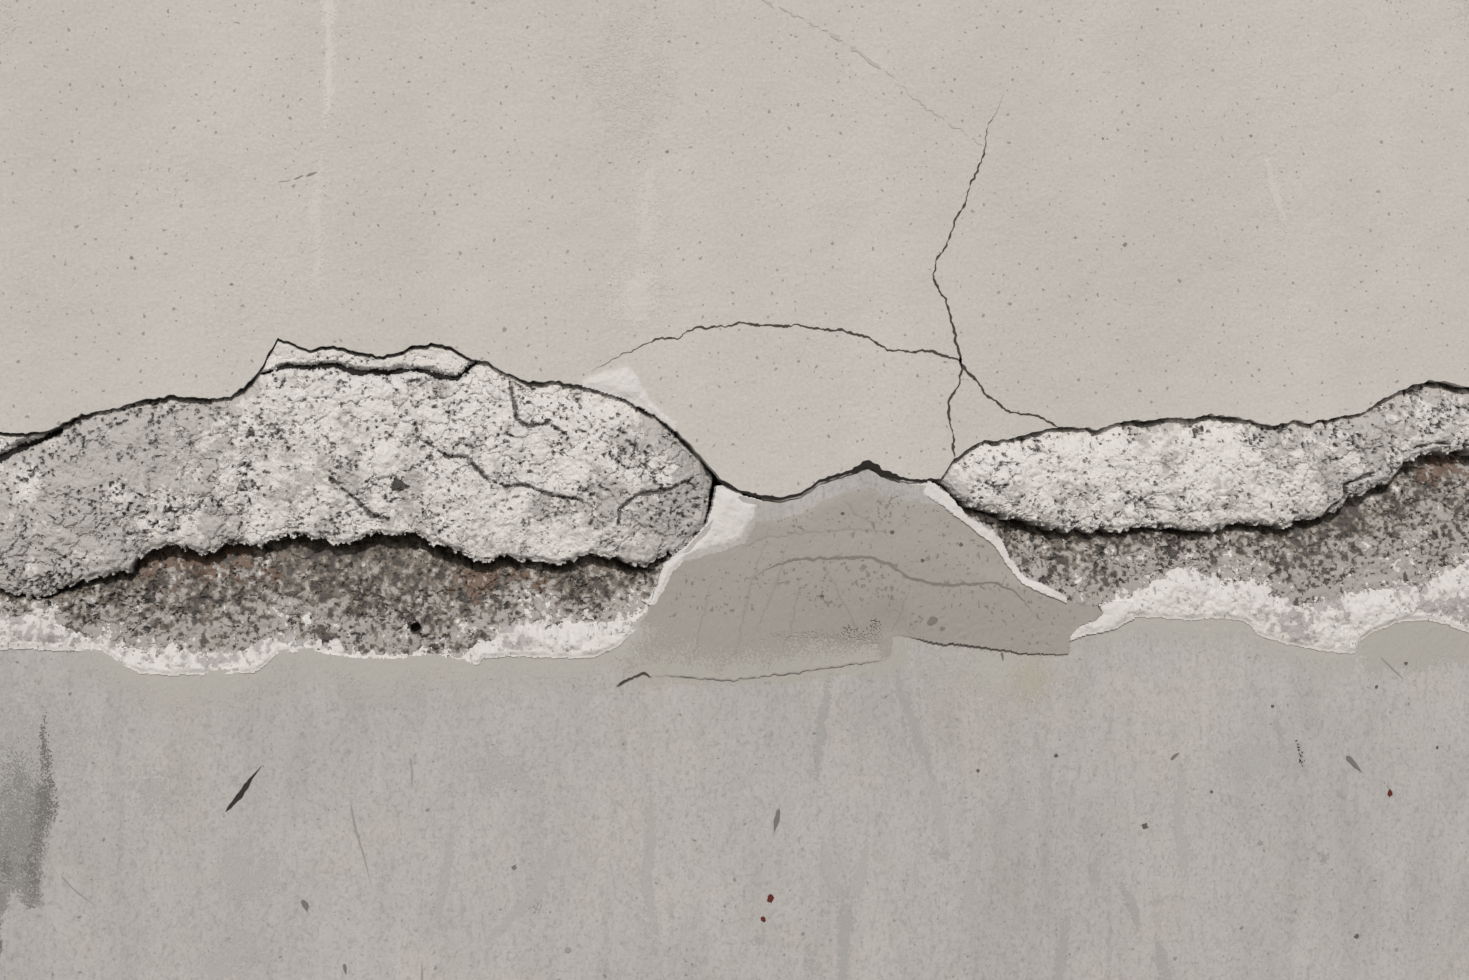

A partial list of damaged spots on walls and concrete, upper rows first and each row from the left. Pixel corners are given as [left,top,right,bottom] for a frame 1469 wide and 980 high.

spalling [0,339,762,676]
crack [425,441,584,504]
crack [600,0,1058,610]
spalling [892,381,1469,654]
water stain [0,613,1469,953]